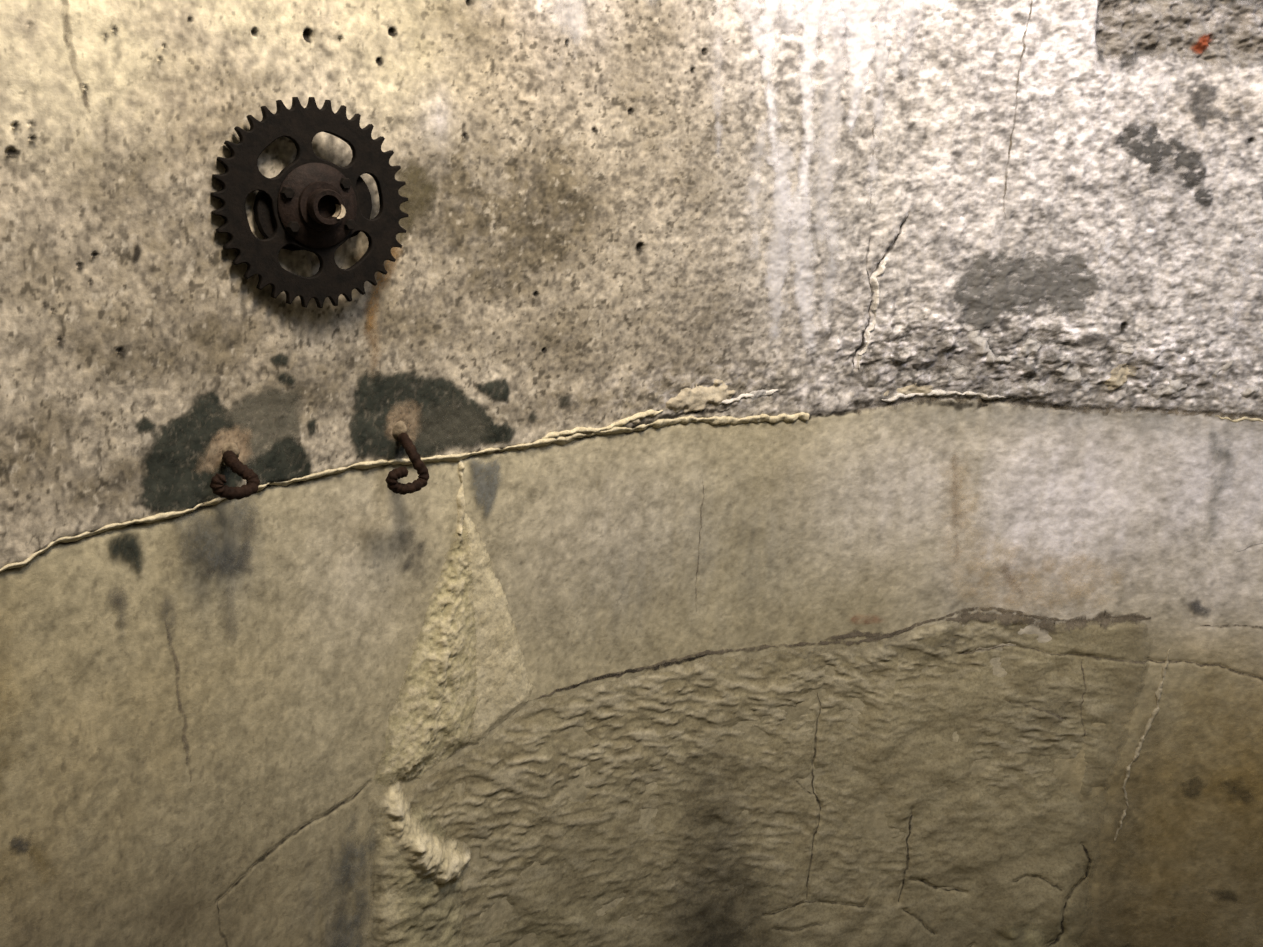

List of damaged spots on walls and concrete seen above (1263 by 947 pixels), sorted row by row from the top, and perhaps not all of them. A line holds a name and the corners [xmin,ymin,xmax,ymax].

spalling [1096,0,1263,67]
damp [738,0,919,348]
crack [852,80,909,368]
corrosion [201,428,250,469]
crack [257,389,1263,492]
crack [0,497,226,573]
crack [527,607,1263,946]
crack [218,788,363,909]